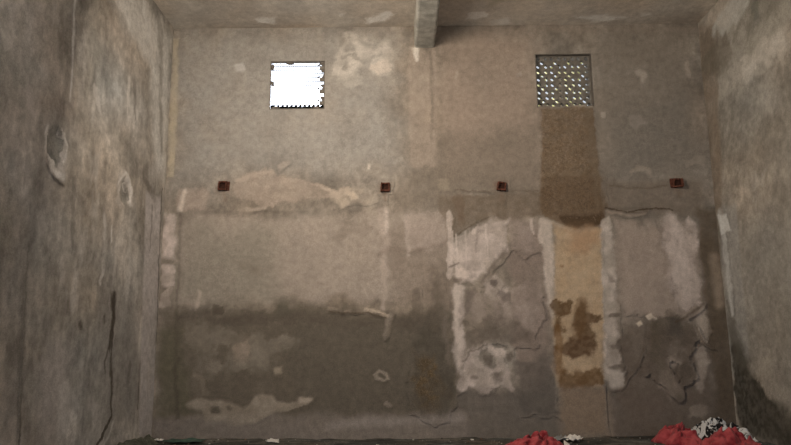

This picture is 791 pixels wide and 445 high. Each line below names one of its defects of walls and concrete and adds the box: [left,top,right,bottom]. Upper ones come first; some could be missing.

spalling [43,119,72,184]
crack [77,287,118,445]
water stain [141,0,181,178]
water stain [140,162,558,427]
water stain [330,9,442,171]
peeling [610,216,680,328]
water stain [598,210,714,421]
water stain [699,0,791,445]